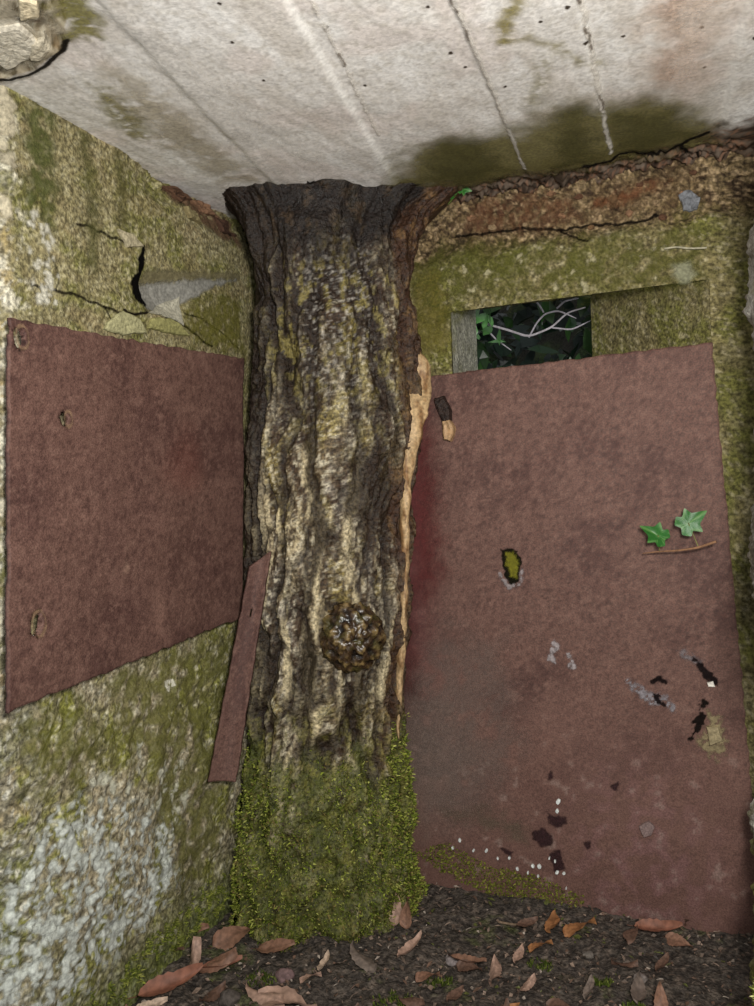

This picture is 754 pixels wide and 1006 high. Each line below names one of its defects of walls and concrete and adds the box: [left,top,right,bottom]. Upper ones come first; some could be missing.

crack [13,15,40,23]
crack [0,39,70,81]
crack [582,131,710,168]
crack [76,223,131,248]
crack [31,257,119,319]
corrosion [411,450,430,578]
corrosion [498,548,523,589]
corrosion [681,650,718,687]
corrosion [626,676,675,712]
corrosion [688,699,727,754]